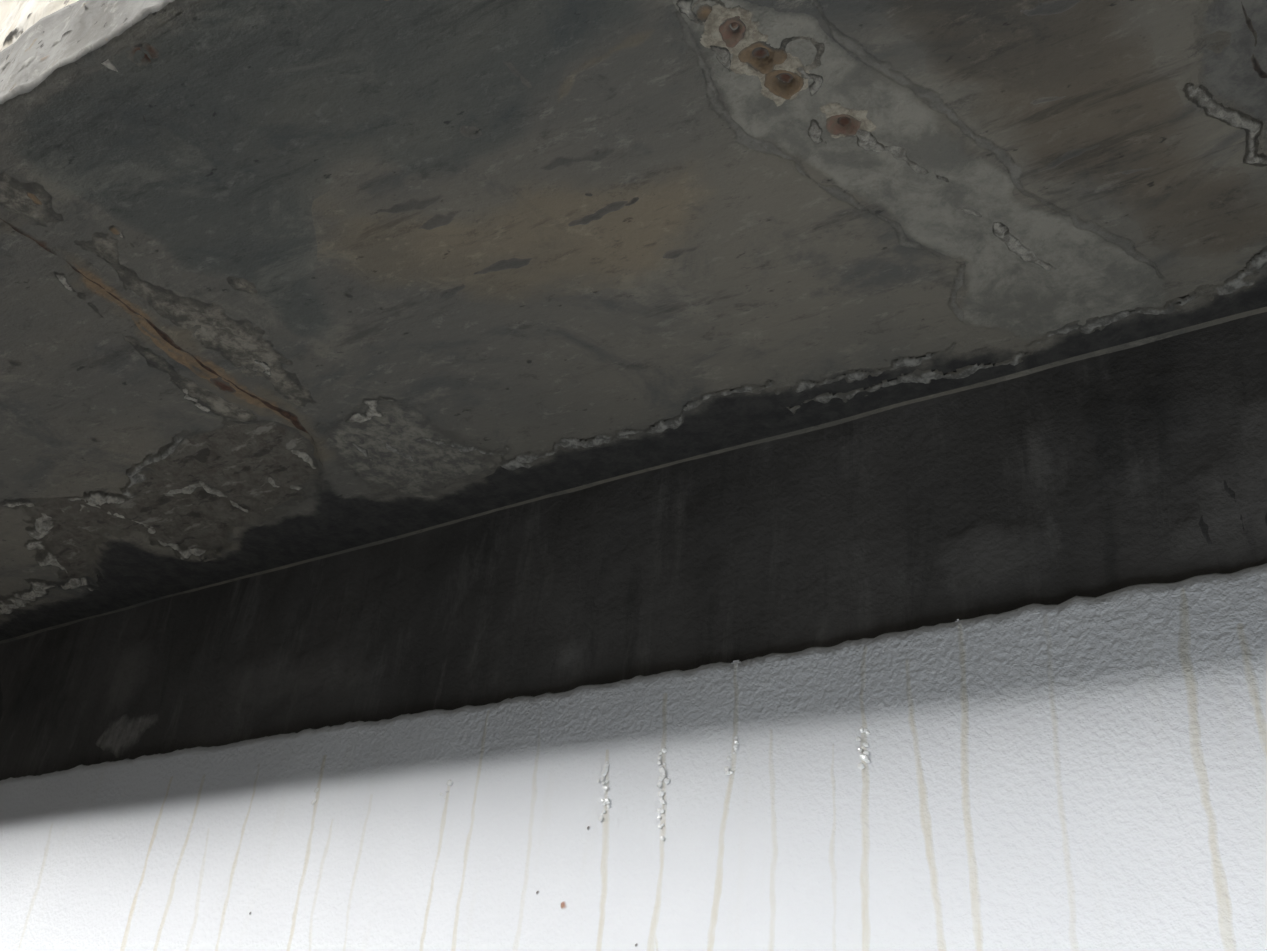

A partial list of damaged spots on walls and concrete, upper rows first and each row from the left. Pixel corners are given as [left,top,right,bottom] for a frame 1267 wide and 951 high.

damp [95,626,162,758]
damp [153,774,210,951]
damp [286,754,334,951]
damp [419,780,452,951]
damp [595,749,610,951]
damp [646,693,670,951]
damp [706,660,741,951]
damp [856,645,871,951]
damp [905,658,947,951]
damp [955,619,984,951]
damp [1177,587,1237,951]